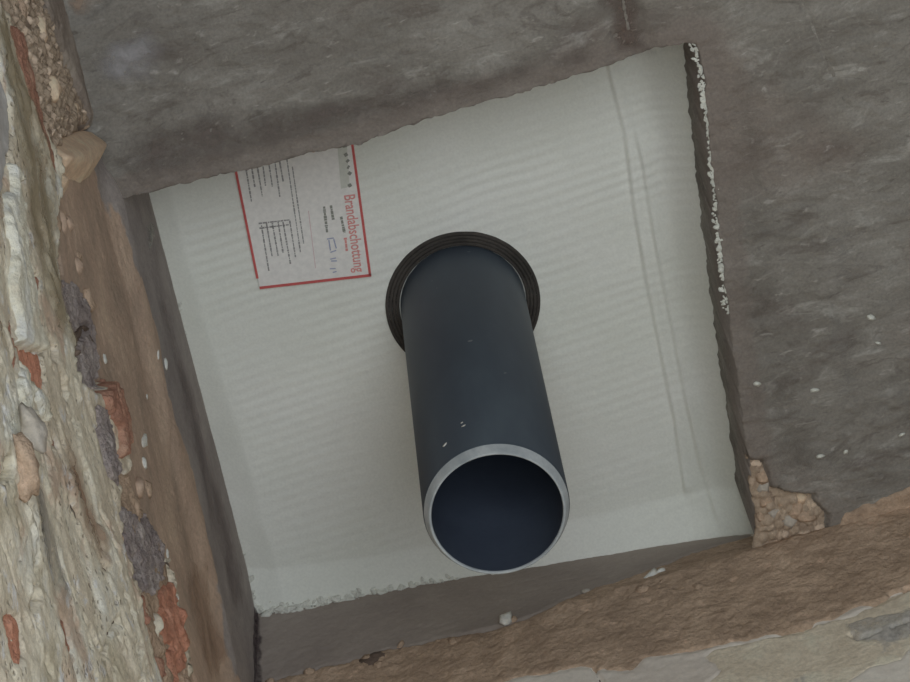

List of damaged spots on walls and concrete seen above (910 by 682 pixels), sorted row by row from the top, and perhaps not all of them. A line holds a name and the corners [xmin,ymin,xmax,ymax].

flaking render [10,25,57,173]
crack [621,0,630,30]
flaking render [57,159,255,682]
flaking render [265,454,910,682]